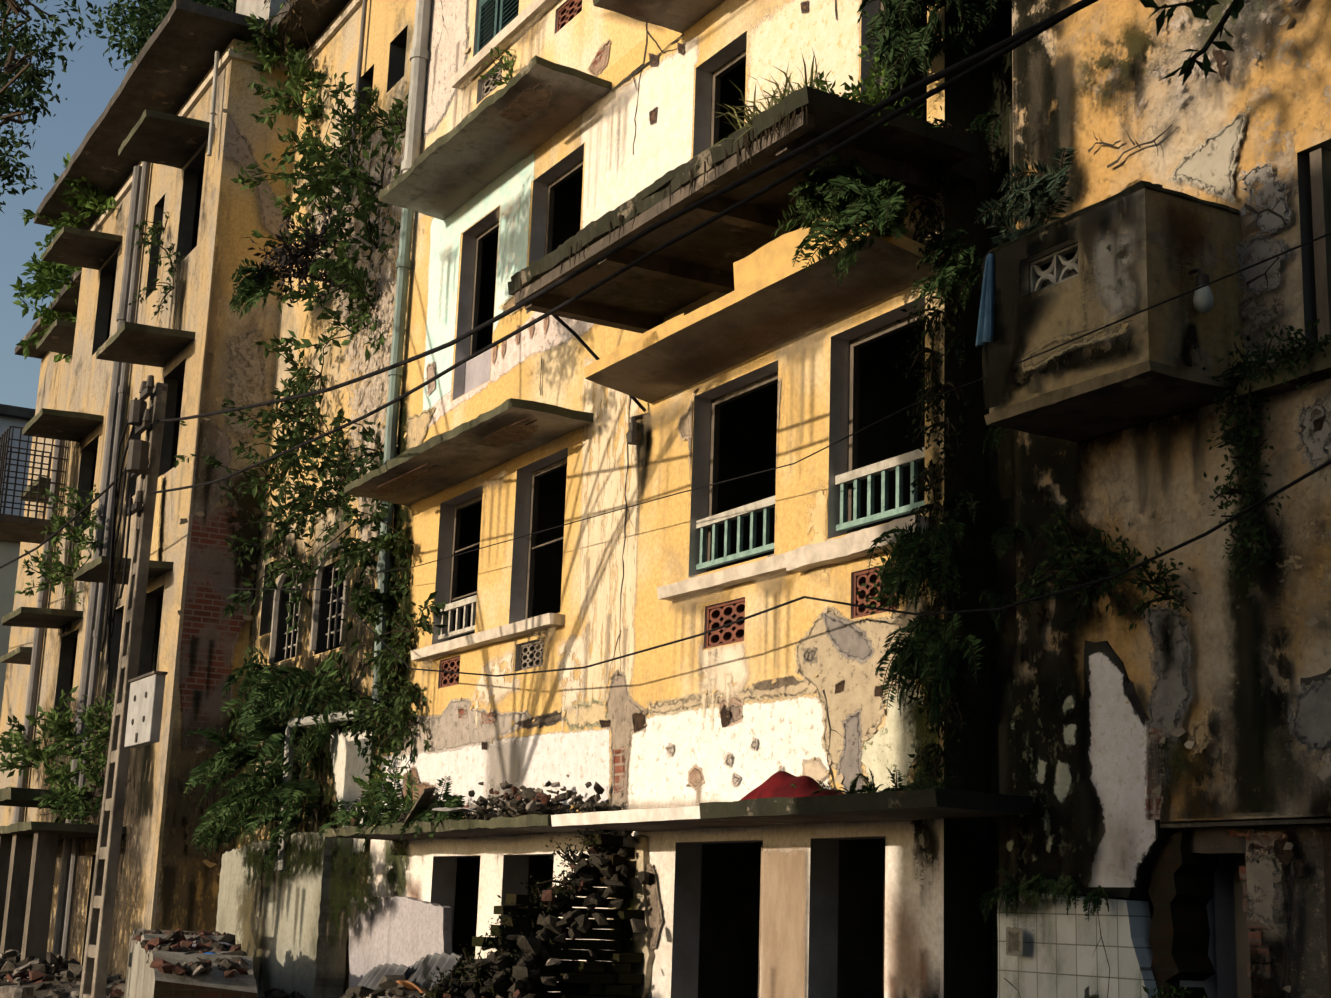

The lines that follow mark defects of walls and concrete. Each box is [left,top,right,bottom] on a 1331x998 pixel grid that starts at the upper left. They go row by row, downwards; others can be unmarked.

peeling [301,0,469,491]
leakage [982,0,1135,410]
peeling [1021,320,1129,372]
crack [1088,125,1172,168]
peeling [1236,162,1292,296]
peeling [353,497,381,576]
peeling [393,590,930,809]
leakage [1002,406,1200,888]
peeling [1123,600,1213,820]
leakage [1178,702,1246,819]
leakage [1259,526,1292,793]
spalling [1148,830,1219,998]